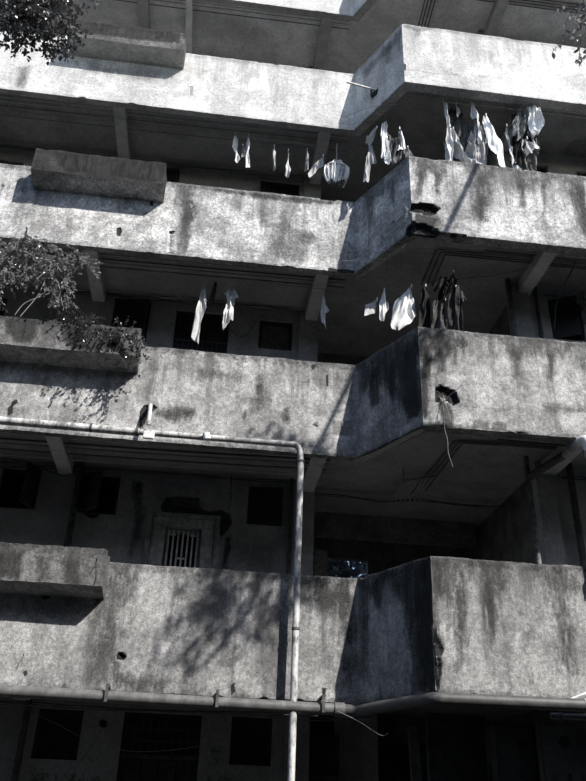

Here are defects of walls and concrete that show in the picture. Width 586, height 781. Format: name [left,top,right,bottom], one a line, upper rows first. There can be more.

damp [170,187,190,253]
damp [413,157,446,194]
spalling [406,203,467,238]
damp [472,170,496,221]
damp [513,171,586,236]
damp [358,327,467,419]
damp [502,337,575,376]
damp [159,407,197,421]
spalling [425,385,460,428]
peeling [161,497,233,537]
damp [88,567,167,690]
damp [305,557,507,695]